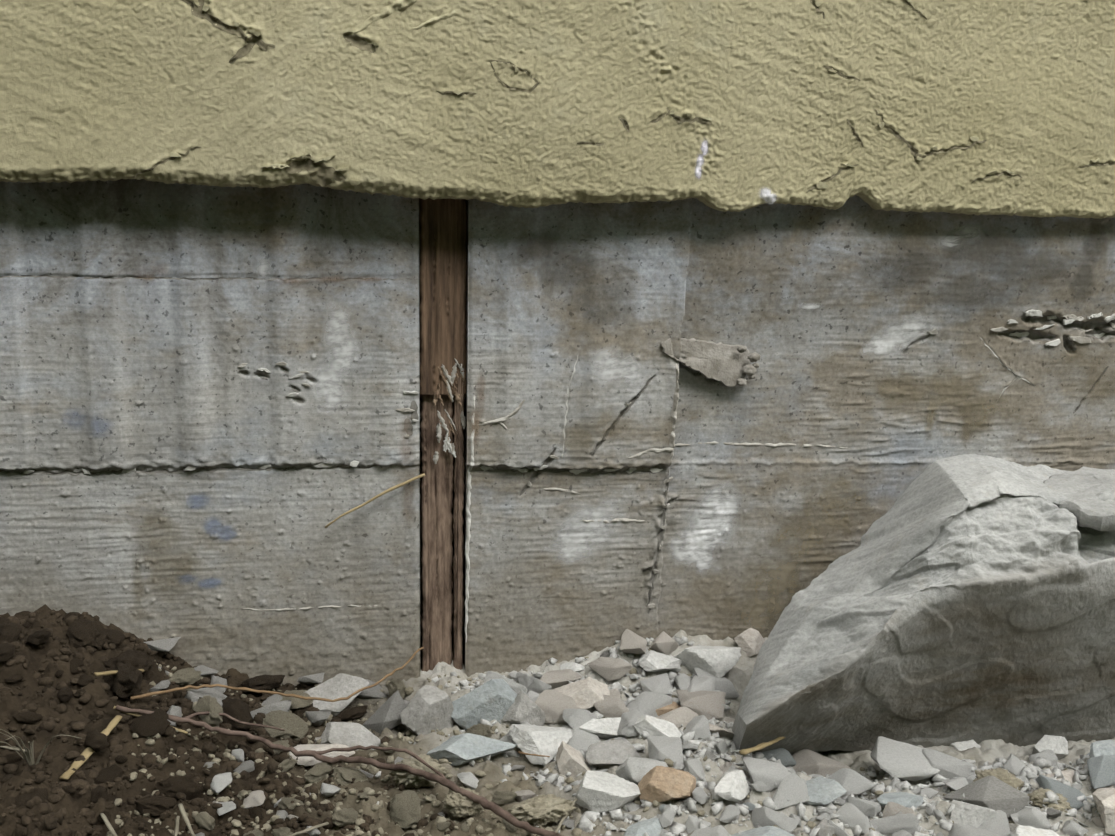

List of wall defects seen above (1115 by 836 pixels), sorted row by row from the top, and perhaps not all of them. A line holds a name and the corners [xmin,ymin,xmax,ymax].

crack [810,0,825,19]
crack [905,0,944,20]
crack [344,34,375,53]
spalling [990,310,1115,352]
hole [237,362,315,403]
crack [474,356,680,614]